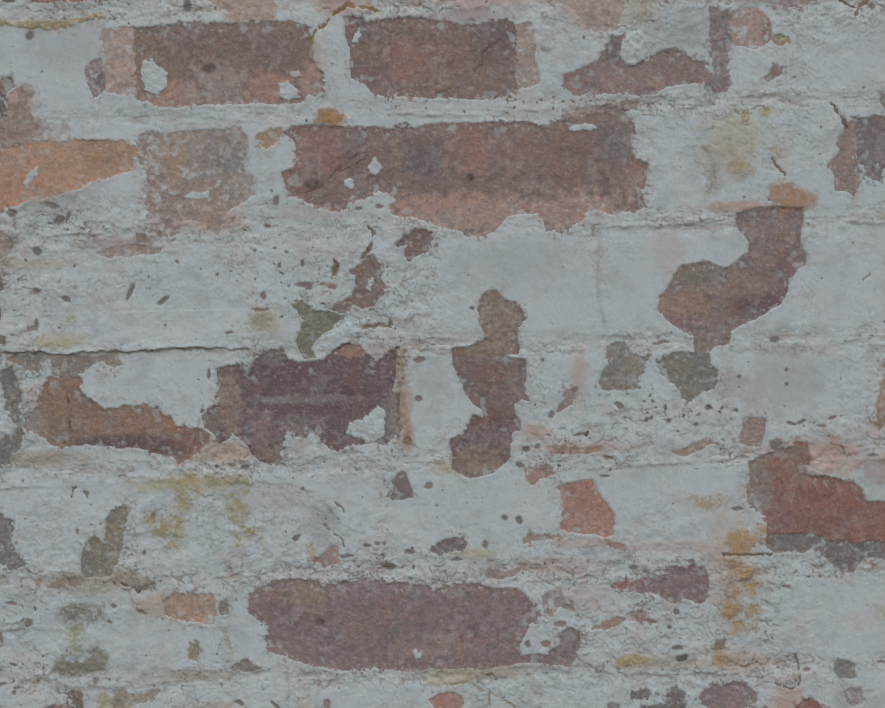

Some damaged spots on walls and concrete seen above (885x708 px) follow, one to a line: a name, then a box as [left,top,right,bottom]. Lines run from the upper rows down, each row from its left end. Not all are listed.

peeling [84,20,325,108]
peeling [344,16,540,101]
peeling [550,0,790,98]
peeling [0,113,648,262]
peeling [827,94,885,198]
peeling [0,254,402,465]
peeling [450,291,529,478]
peeling [598,207,806,404]
spalling [739,416,885,573]
peeling [248,564,581,672]
peeling [630,685,686,708]
peeling [698,682,766,708]